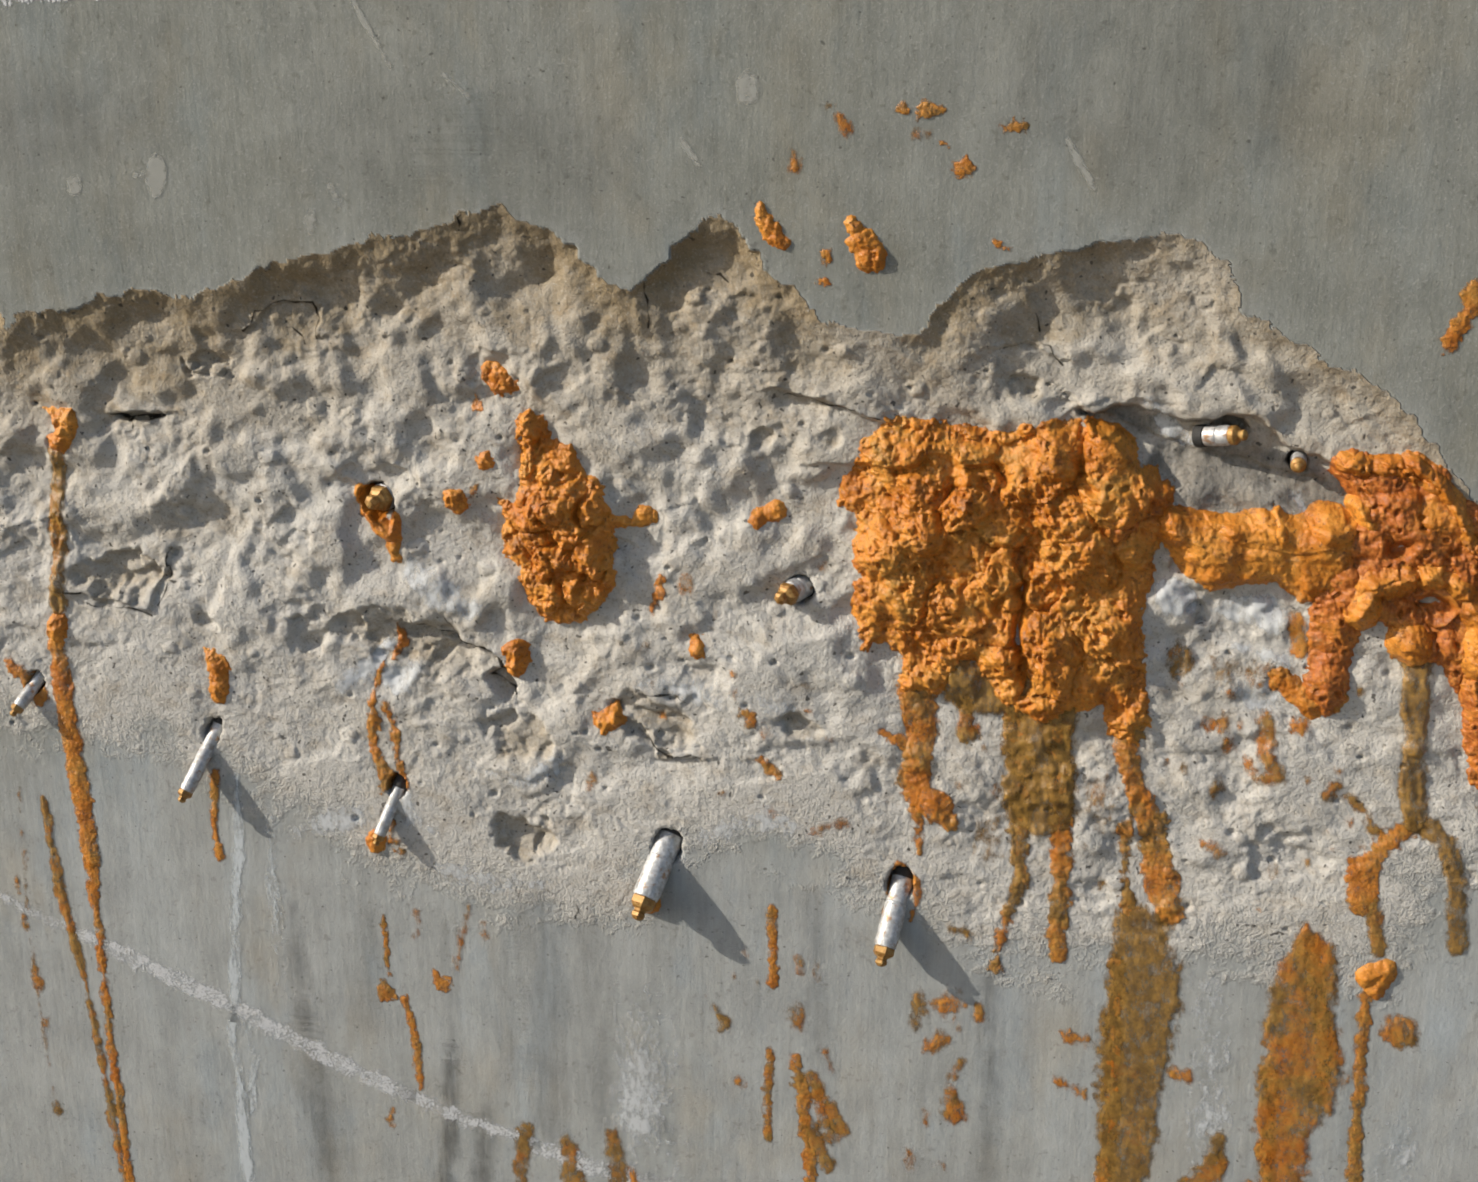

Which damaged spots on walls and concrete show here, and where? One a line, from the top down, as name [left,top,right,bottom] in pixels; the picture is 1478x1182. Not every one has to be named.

crack [242,300,319,344]
spalling [0,202,1478,982]
corrosion [3,406,135,1182]
corrosion [366,623,410,795]
crack [645,694,692,759]
corrosion [1201,711,1309,786]
corrosion [766,904,814,989]
corrosion [1248,662,1469,1182]
corrosion [1053,899,1192,1182]
corrosion [512,1122,534,1182]
corrosion [760,1048,850,1182]
corrosion [1178,1130,1228,1182]